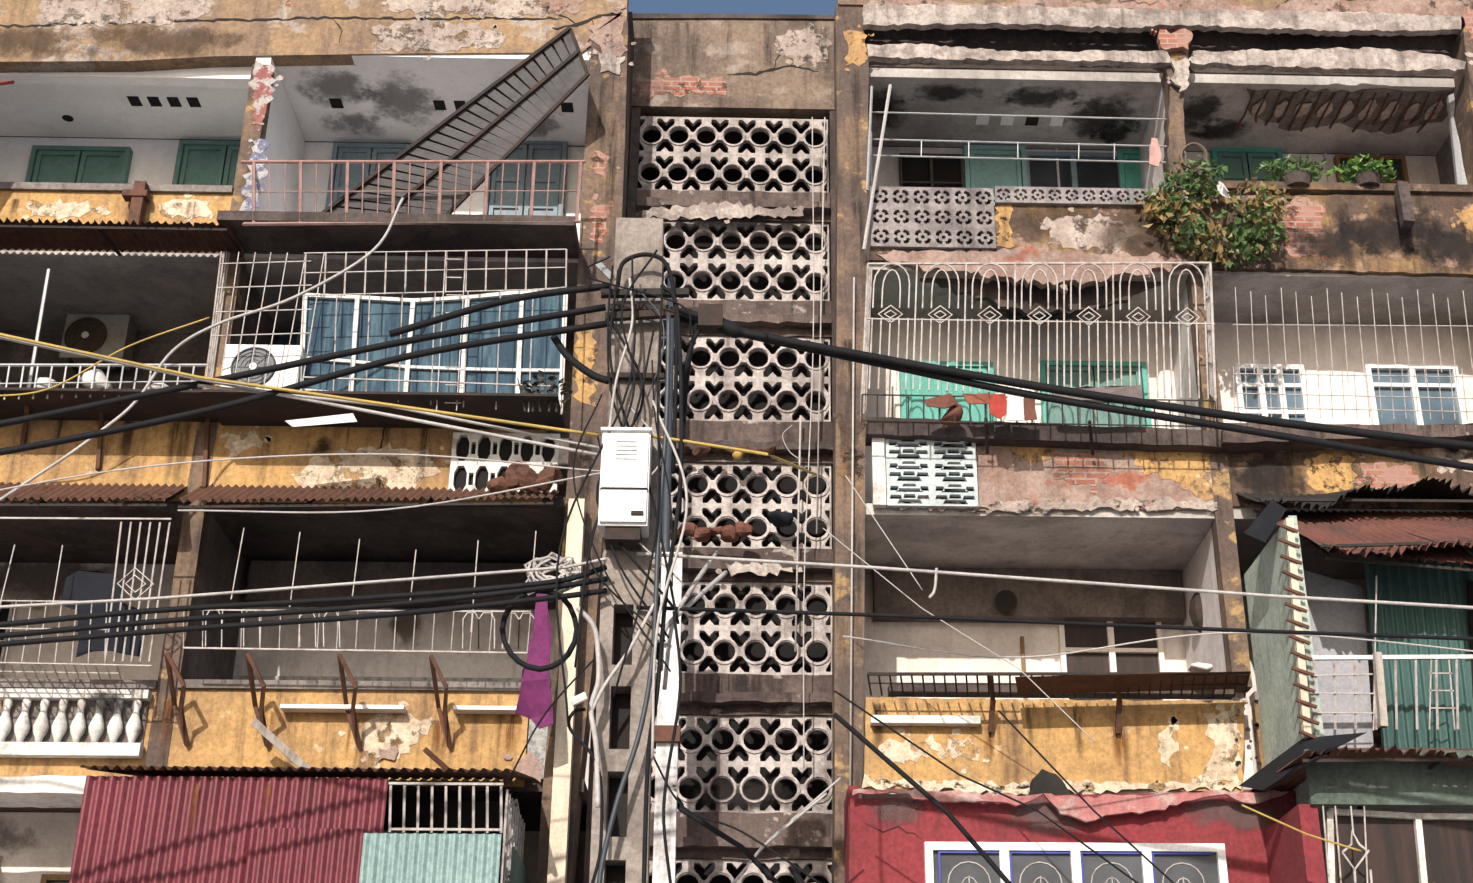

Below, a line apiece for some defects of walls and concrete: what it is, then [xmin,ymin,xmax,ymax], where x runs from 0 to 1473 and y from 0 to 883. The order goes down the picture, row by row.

crack [0,8,626,43]
crack [727,53,819,76]
flaking render [1150,28,1196,93]
mould [868,90,905,127]
mould [922,86,977,101]
mould [1005,87,1132,144]
mould [1183,95,1244,140]
peeling [291,442,451,504]
peeling [338,701,450,769]
leakage [874,704,882,739]
spalling [862,727,1030,796]
flaking render [1063,698,1262,795]